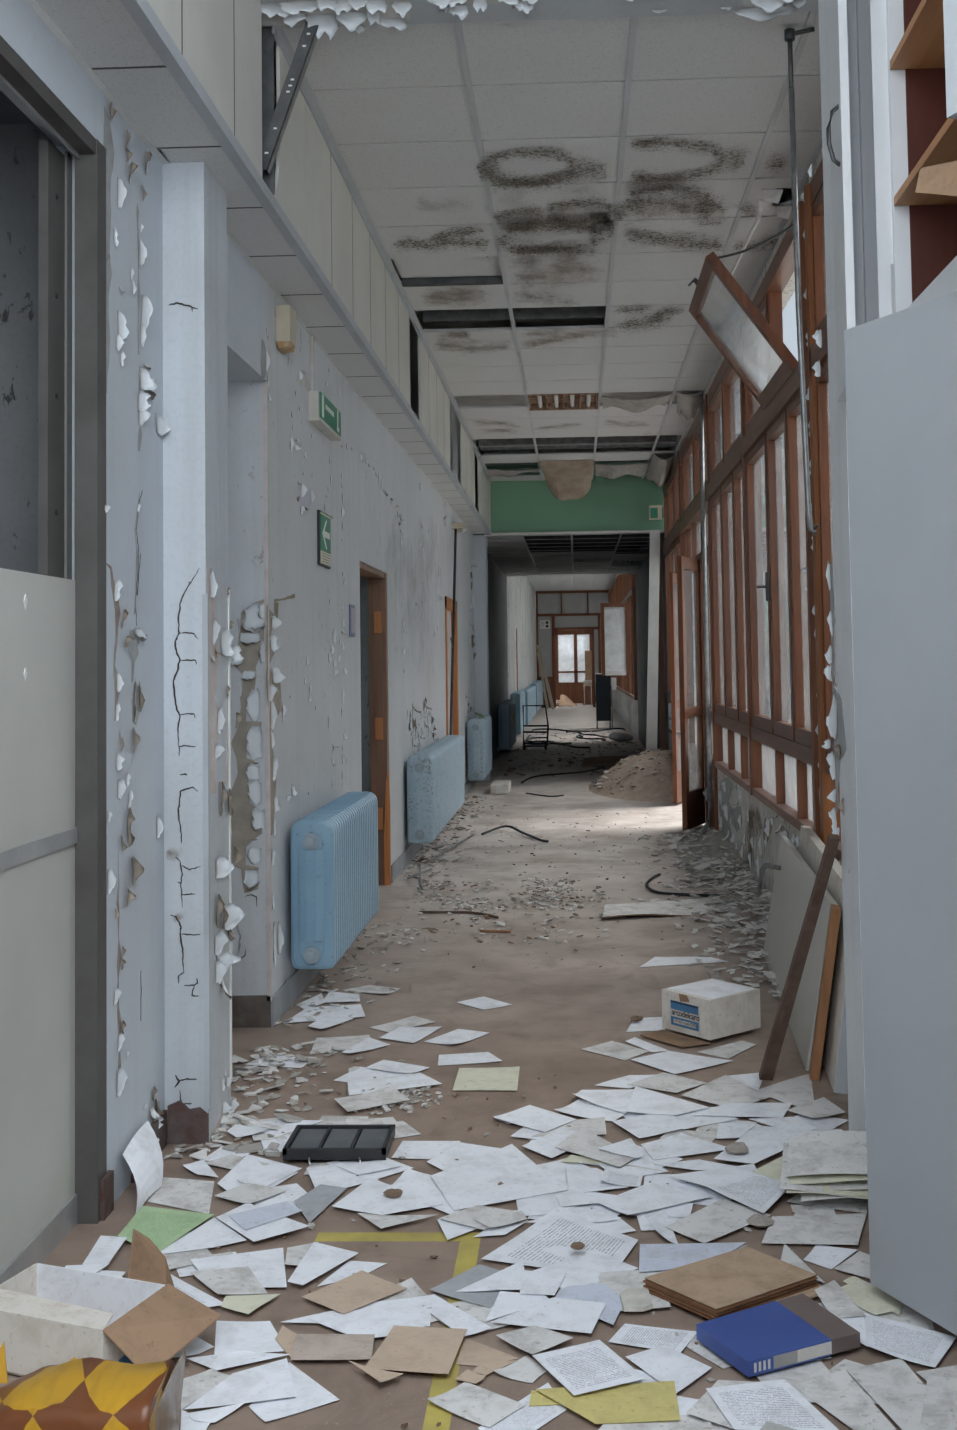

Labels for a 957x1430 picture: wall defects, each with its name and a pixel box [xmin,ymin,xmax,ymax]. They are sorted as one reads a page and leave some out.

peeling [260,0,538,40]
peeling [720,0,806,21]
peeling [103,102,171,451]
water stain [394,137,777,279]
water stain [617,304,683,330]
peeling [106,492,148,1097]
crack [170,569,200,997]
peeling [206,568,310,1000]
peeling [407,697,439,754]